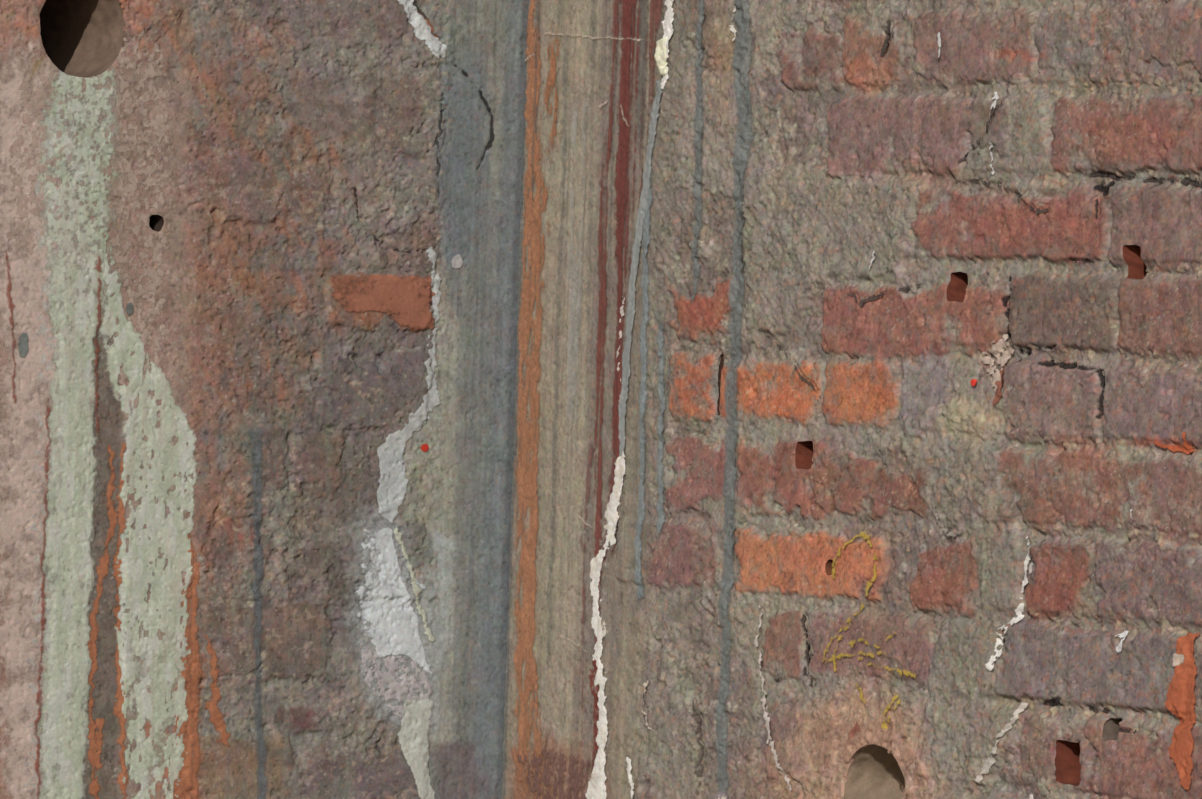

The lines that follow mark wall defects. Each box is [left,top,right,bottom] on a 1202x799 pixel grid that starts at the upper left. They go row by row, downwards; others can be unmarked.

corrosion [0,253,17,422]
corrosion [35,405,51,796]
damp [0,23,198,799]
corrosion [87,443,128,799]
corrosion [173,533,230,799]
peeling [332,247,443,799]
crack [353,187,425,253]
crack [398,0,495,197]
peeling [452,254,463,268]
corrosion [512,0,559,799]
crack [585,0,674,799]